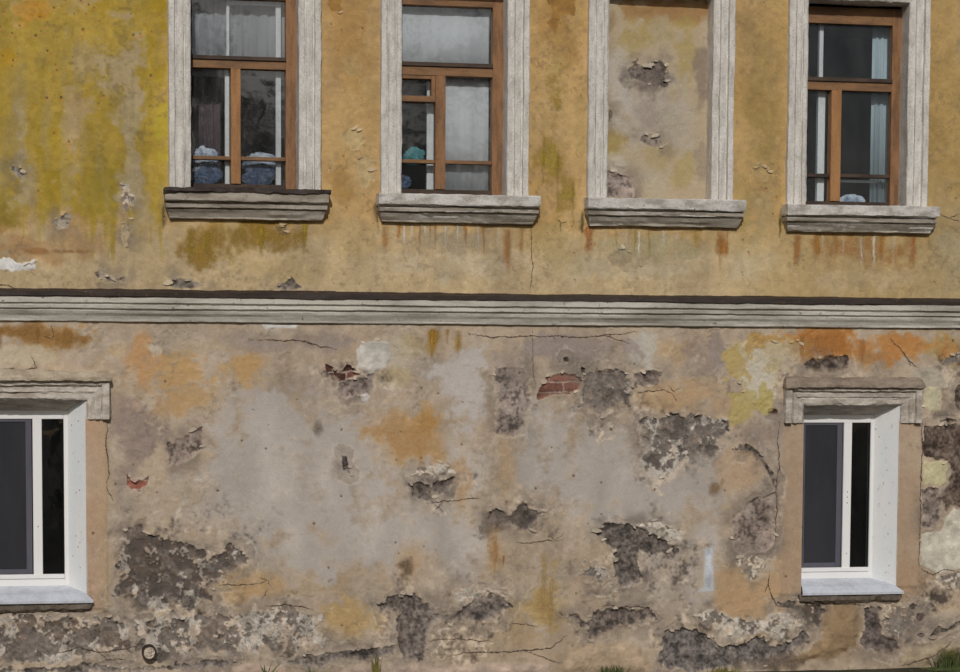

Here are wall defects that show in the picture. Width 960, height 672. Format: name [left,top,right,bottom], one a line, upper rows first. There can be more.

spalling [628,58,671,88]
peeling [325,338,393,403]
spalling [492,357,663,439]
spalling [408,460,457,502]
spalling [487,500,548,534]
spalling [637,410,779,581]
crack [767,423,780,541]
spalling [919,384,960,591]
spalling [0,524,514,672]
spalling [561,599,827,672]